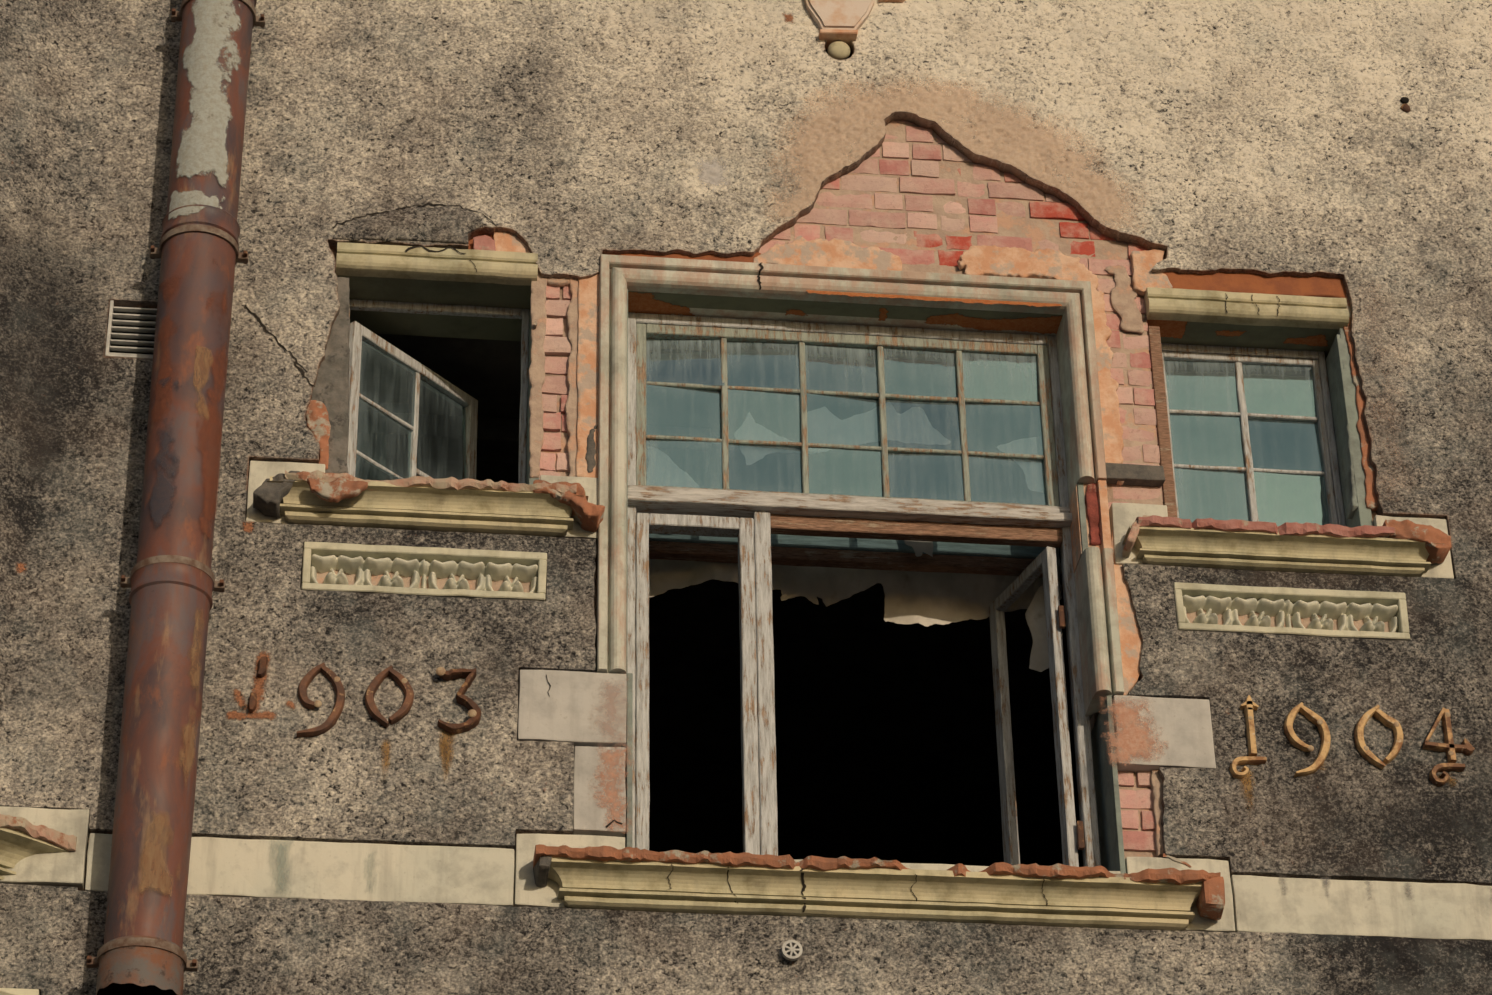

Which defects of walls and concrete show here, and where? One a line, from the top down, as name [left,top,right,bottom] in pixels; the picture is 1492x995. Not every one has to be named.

spalling [533,685,909,887]
flaking render [607,121,1452,920]